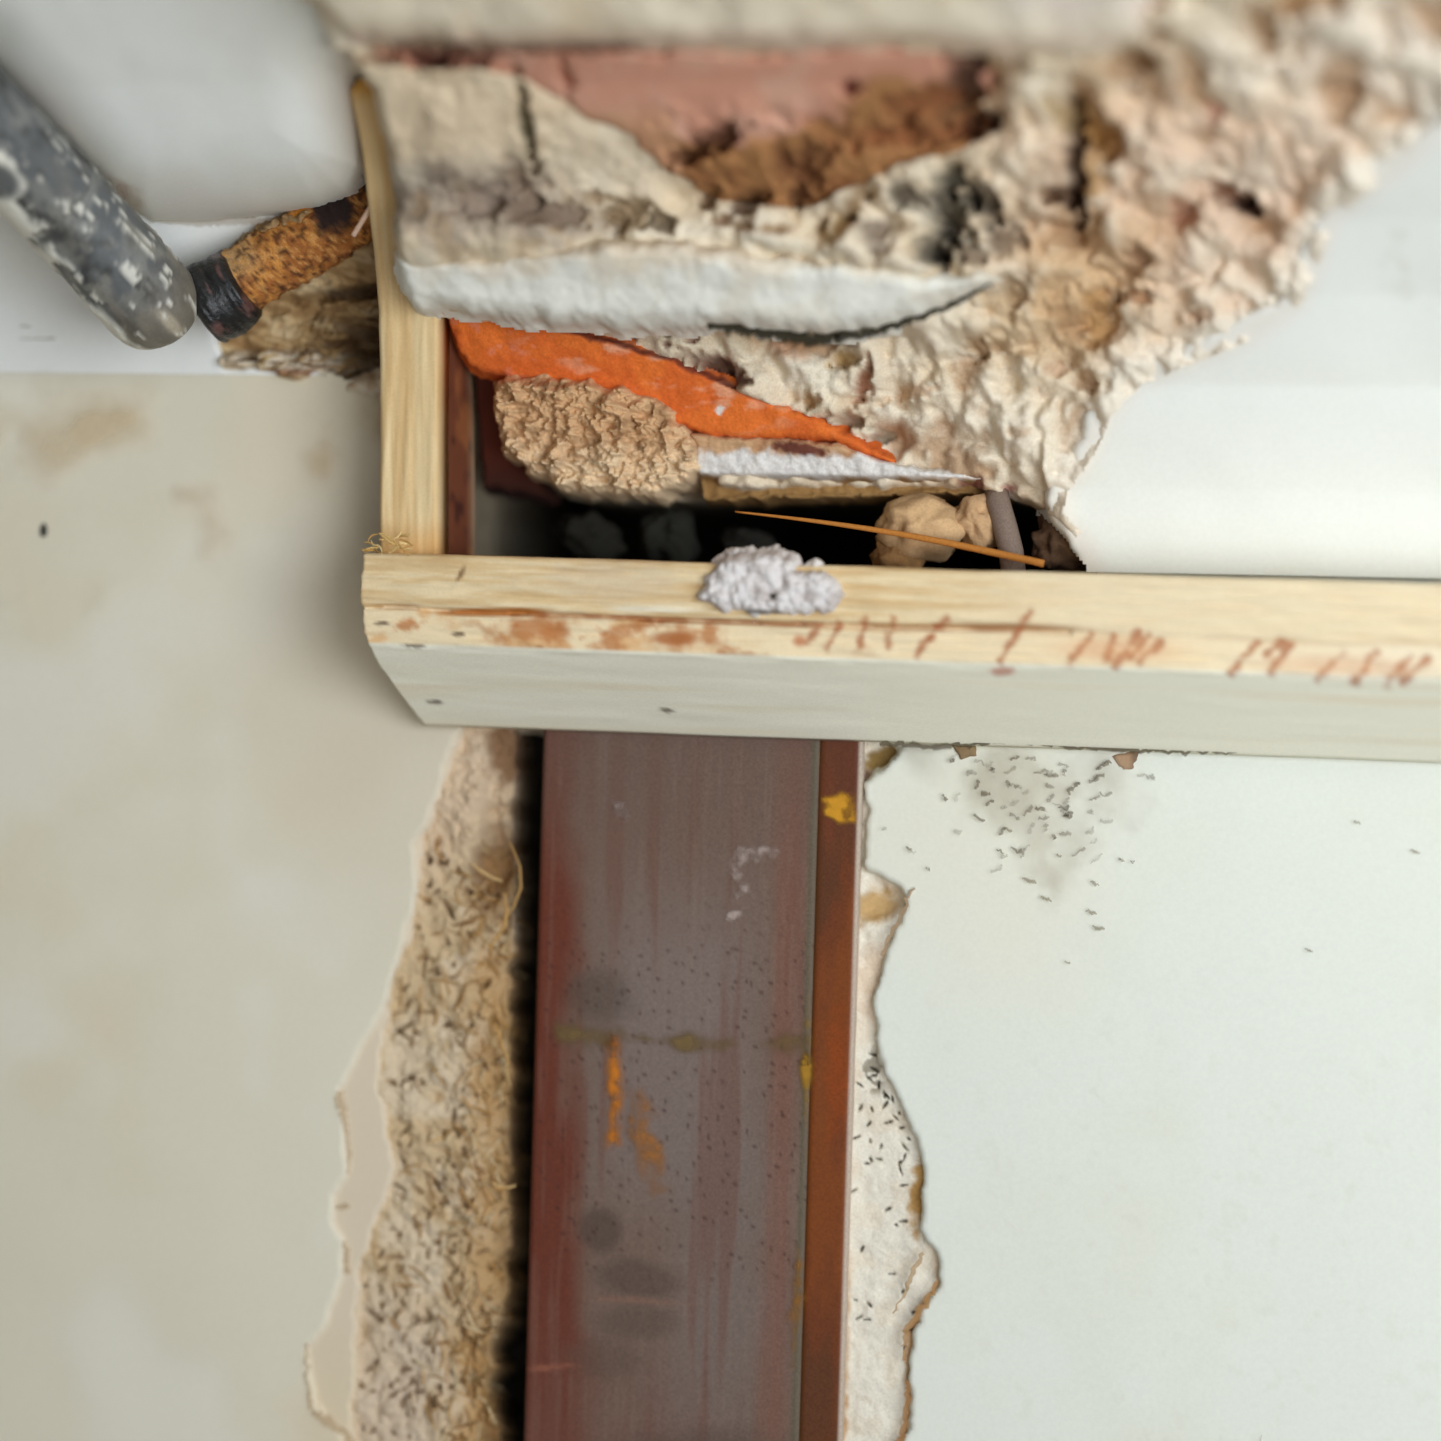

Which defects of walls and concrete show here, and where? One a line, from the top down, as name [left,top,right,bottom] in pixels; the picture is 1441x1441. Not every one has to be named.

flaking render [308,0,1441,572]
flaking render [352,727,544,1441]
rust [557,1028,662,1164]
rust [781,1038,812,1090]
flaking render [844,742,940,1441]
flaking render [973,767,994,822]